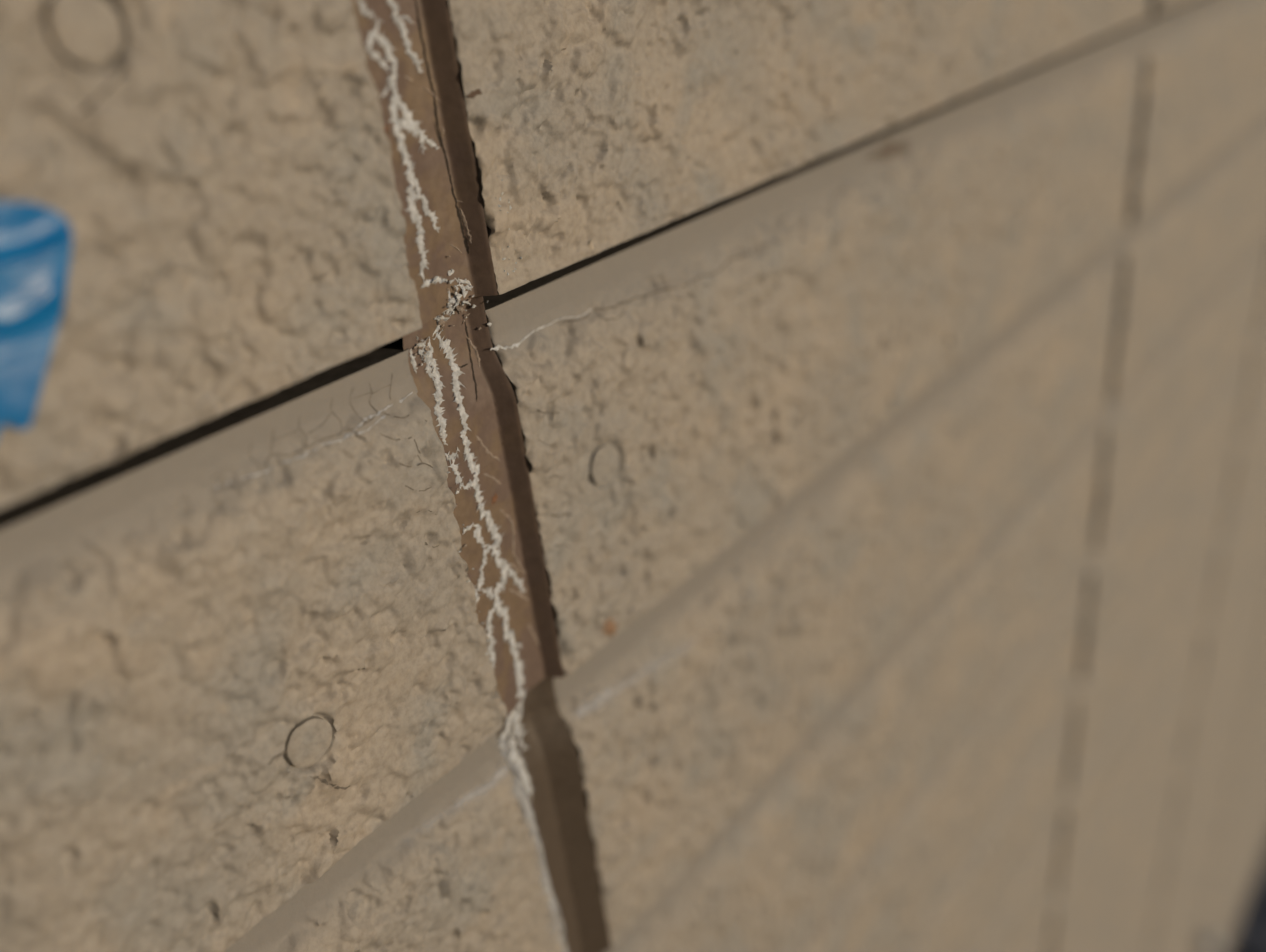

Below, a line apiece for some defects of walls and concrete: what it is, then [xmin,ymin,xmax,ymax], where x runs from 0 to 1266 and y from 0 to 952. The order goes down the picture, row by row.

peeling [413,200,492,367]
crack [214,0,769,715]
crack [310,776,350,790]
peeling [499,706,534,800]